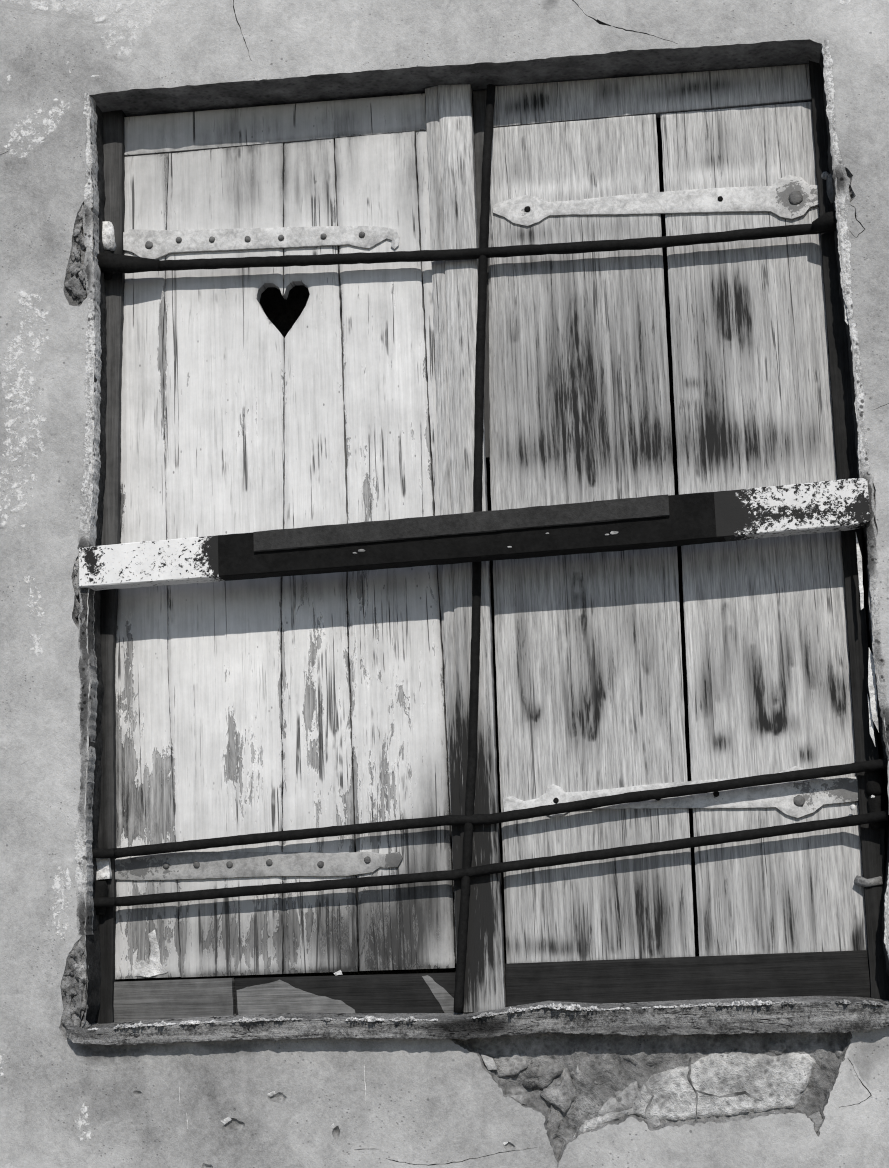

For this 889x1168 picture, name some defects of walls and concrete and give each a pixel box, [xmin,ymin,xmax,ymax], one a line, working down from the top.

crack [572,0,677,44]
flaking render [448,1031,852,1168]